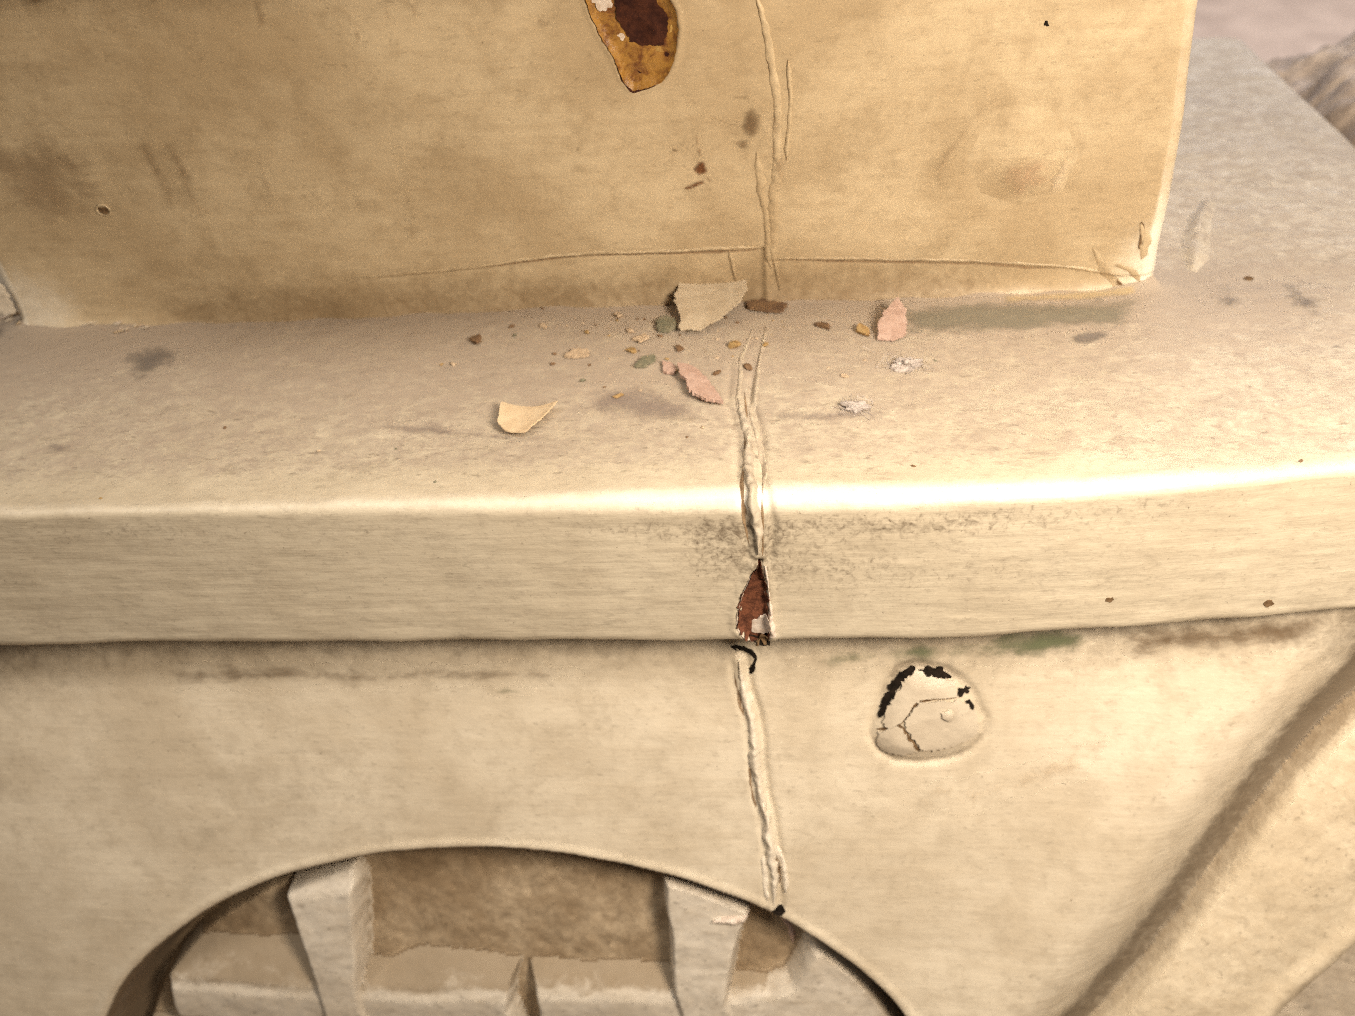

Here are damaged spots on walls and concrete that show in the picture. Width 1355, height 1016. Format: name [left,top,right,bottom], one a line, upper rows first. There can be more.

peeling [586,0,679,93]
crack [333,0,1119,291]
crack [735,327,768,556]
peeling [736,559,777,646]
crack [713,645,796,943]